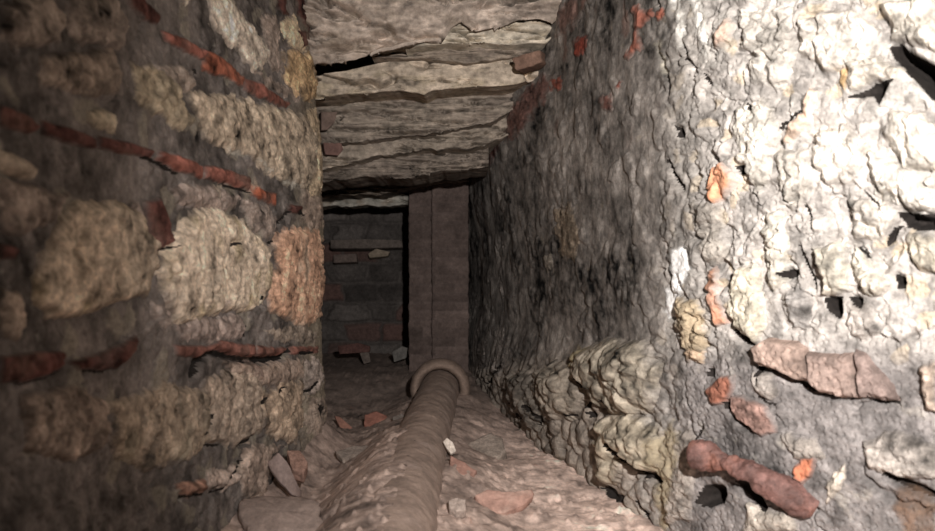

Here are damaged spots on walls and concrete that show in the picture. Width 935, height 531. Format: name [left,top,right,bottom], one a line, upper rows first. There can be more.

spalling [848,78,893,105]
spalling [890,44,935,100]